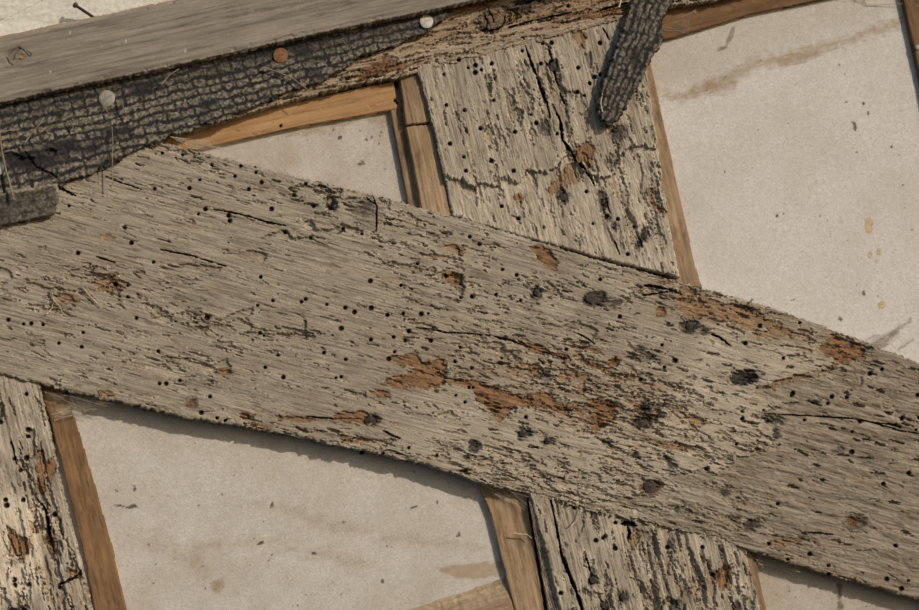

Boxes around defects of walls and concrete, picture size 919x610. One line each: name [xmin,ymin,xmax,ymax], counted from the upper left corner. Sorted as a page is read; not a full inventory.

crack [482,10,572,32]
crack [596,2,628,40]
crack [526,46,610,213]
peeling [370,343,636,431]
peeling [758,334,866,391]
crack [550,500,592,610]